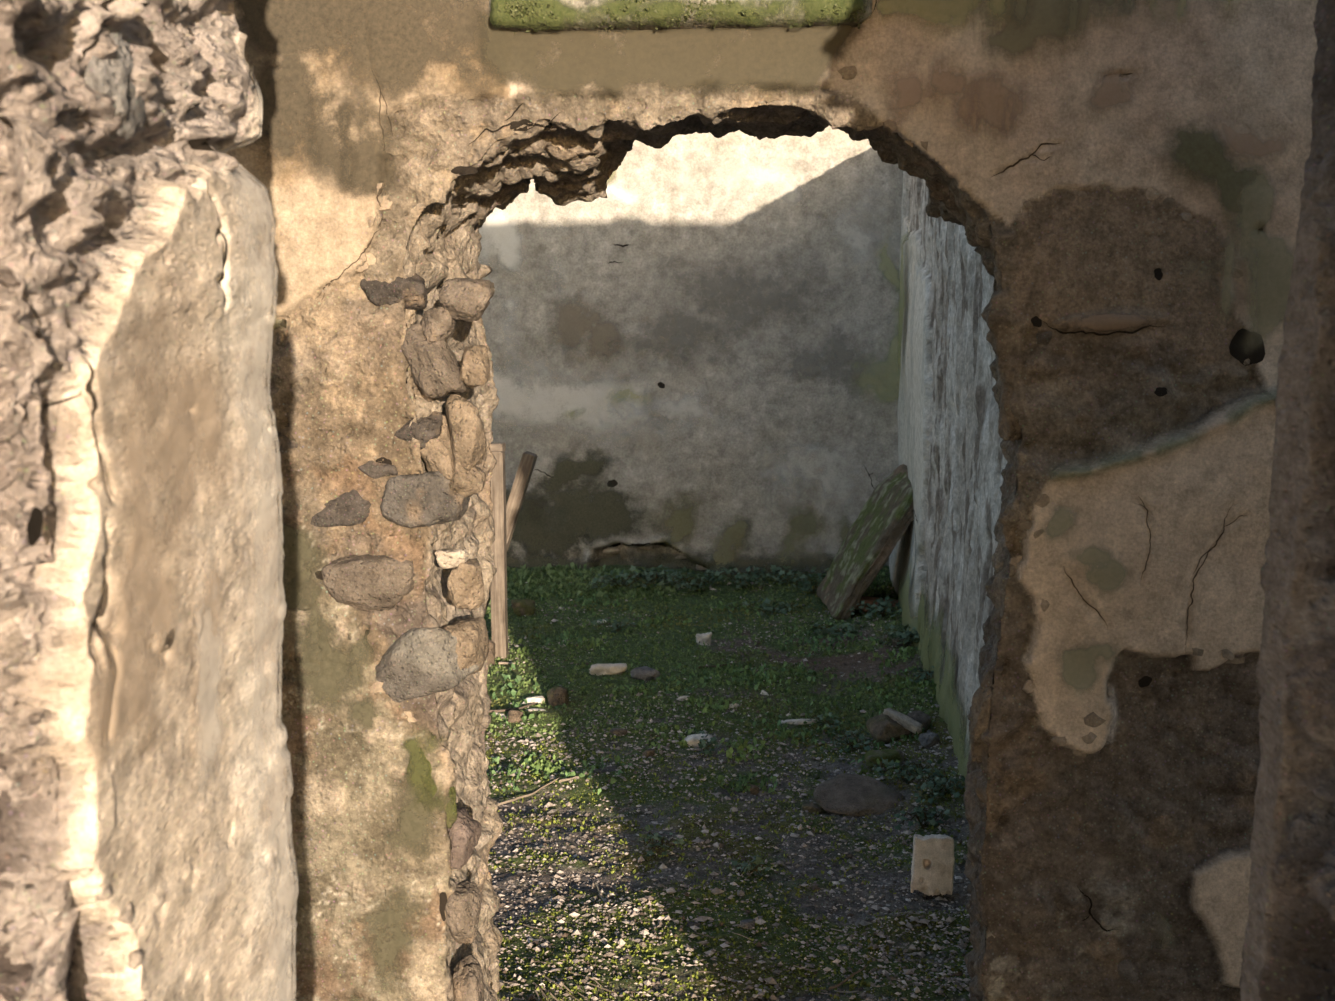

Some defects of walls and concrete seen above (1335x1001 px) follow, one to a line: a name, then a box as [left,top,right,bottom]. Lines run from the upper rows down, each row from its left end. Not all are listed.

crack [208,193,228,307]
water stain [478,209,521,271]
water stain [600,170,638,205]
crack [24,297,108,494]
water stain [492,364,703,436]
spalling [266,65,928,1001]
water stain [506,451,834,575]
crack [1063,565,1108,627]
spalling [915,179,1276,1001]
crack [1135,497,1151,583]
crack [1185,504,1247,652]